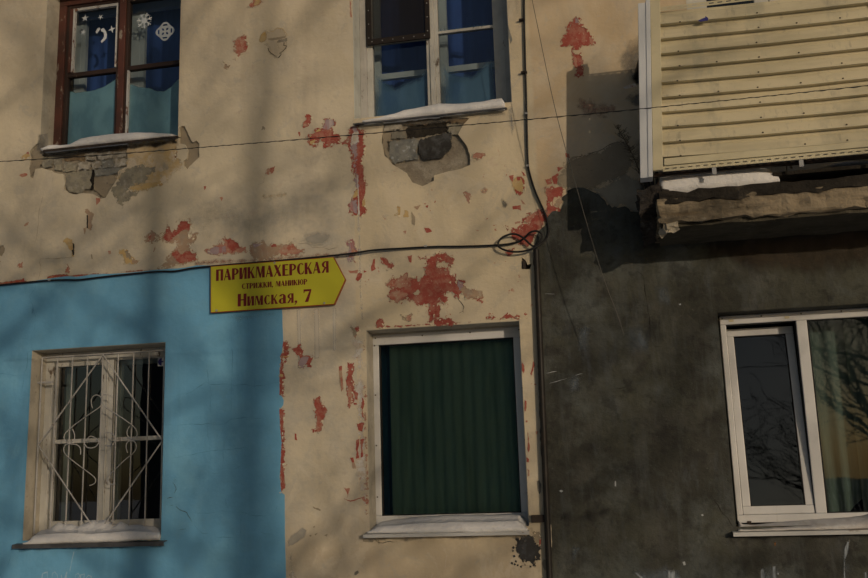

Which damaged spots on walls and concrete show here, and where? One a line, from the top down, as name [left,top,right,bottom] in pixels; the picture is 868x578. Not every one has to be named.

peeling [223,35,249,70]
peeling [560,16,596,78]
flaking render [19,142,138,234]
flaking render [128,127,199,192]
peeling [298,114,368,217]
flaking render [382,117,487,186]
peeling [144,218,305,270]
spalling [642,211,680,238]
peeling [344,239,484,329]
peeling [279,341,314,397]
peeling [312,396,328,434]
peeling [279,408,297,493]